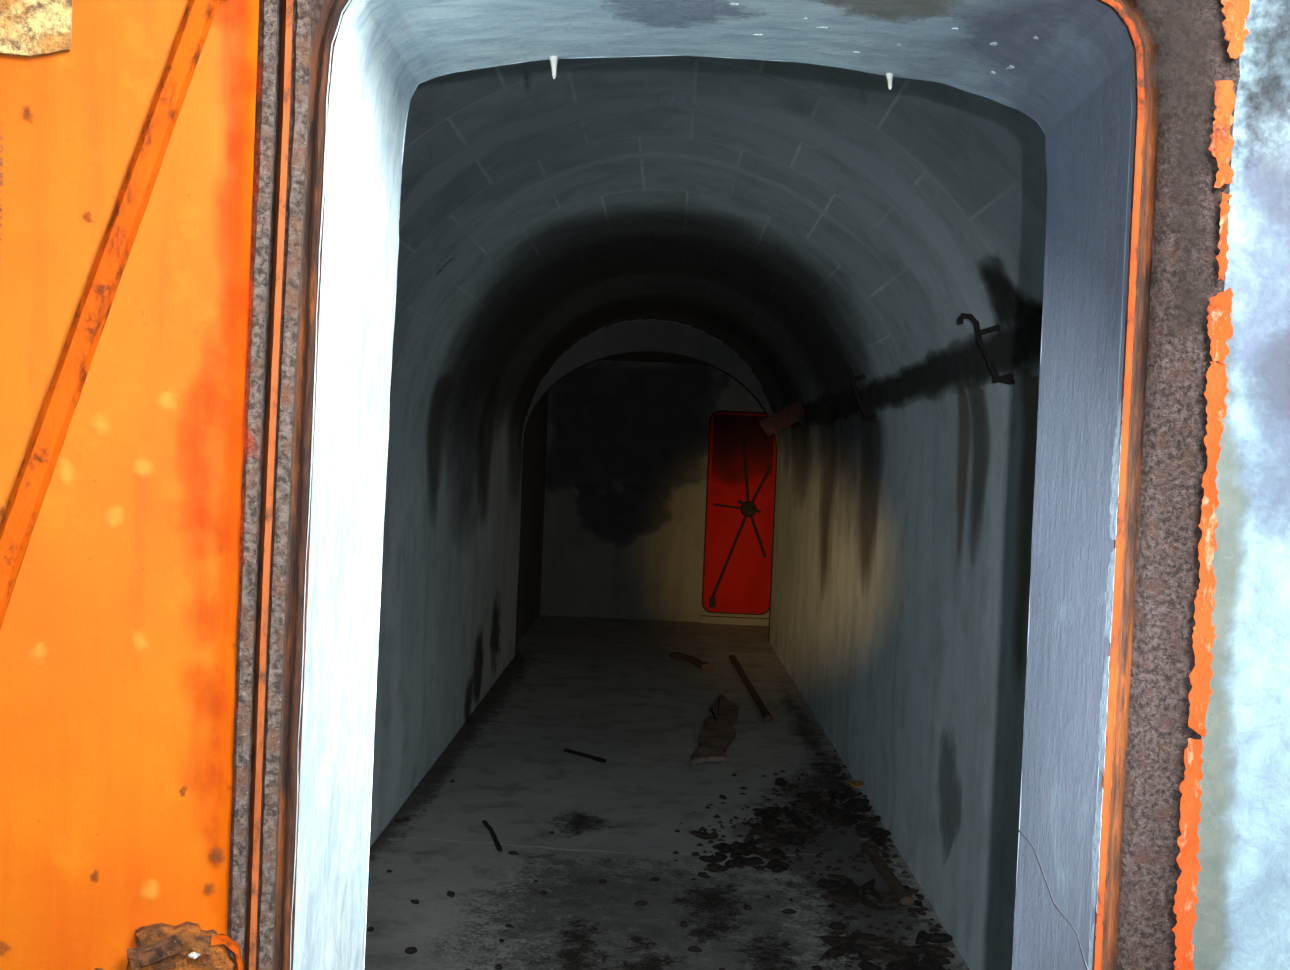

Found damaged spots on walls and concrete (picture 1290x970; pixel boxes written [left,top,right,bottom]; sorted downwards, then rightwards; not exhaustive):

peeling [1220,0,1250,59]
damp [545,361,728,544]
damp [819,402,835,569]
damp [861,398,880,569]
peeling [1171,80,1236,970]
damp [465,595,501,721]
damp [552,813,612,837]
damp [532,920,677,970]
damp [675,885,745,942]